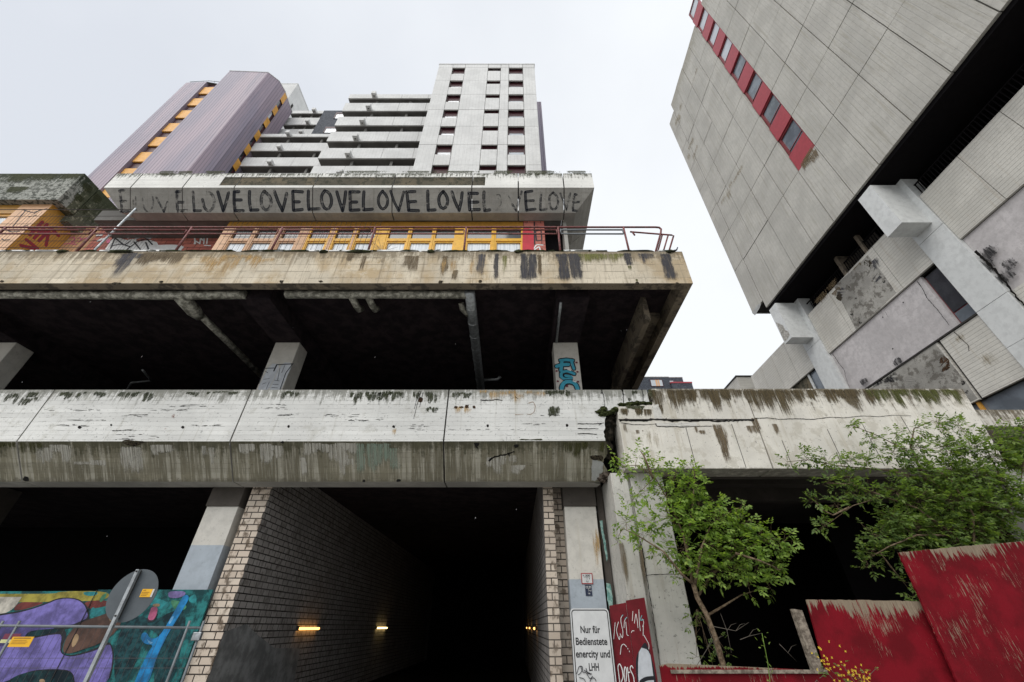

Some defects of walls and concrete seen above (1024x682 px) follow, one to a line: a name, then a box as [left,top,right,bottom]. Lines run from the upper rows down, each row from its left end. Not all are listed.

water stain [5,173,102,213]
water stain [476,253,507,278]
water stain [520,253,542,280]
water stain [556,253,676,282]
peeling [834,255,904,329]
peeling [871,344,977,402]
water stain [3,392,39,405]
water stain [59,391,153,402]
water stain [350,391,438,413]
crack [578,389,910,435]
water stain [621,357,962,438]
water stain [695,425,729,459]